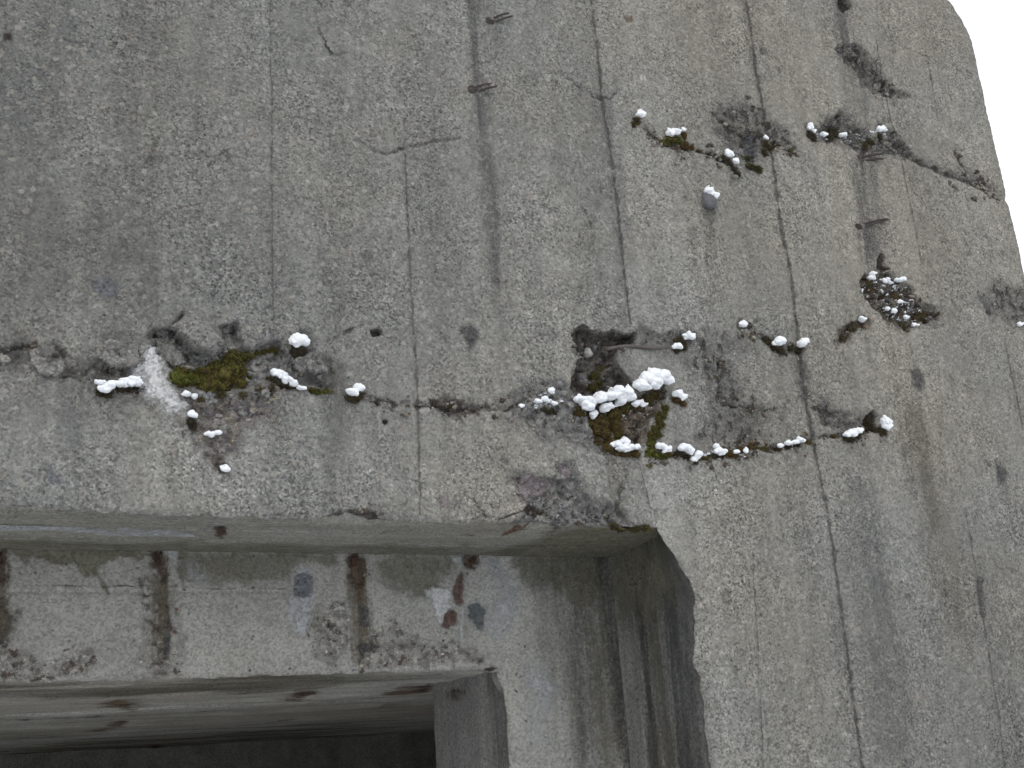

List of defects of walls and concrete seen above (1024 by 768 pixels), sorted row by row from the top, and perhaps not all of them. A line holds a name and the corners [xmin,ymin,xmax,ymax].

crack [576,0,631,324]
crack [0,340,129,378]
leakage [132,345,189,414]
spalling [23,320,351,474]
leakage [461,325,478,348]
spalling [511,324,777,463]
crack [604,6,882,768]
spalling [833,271,941,348]
rust [148,551,171,674]
rust [346,553,375,664]
rust [463,555,479,570]
leakage [482,527,711,768]